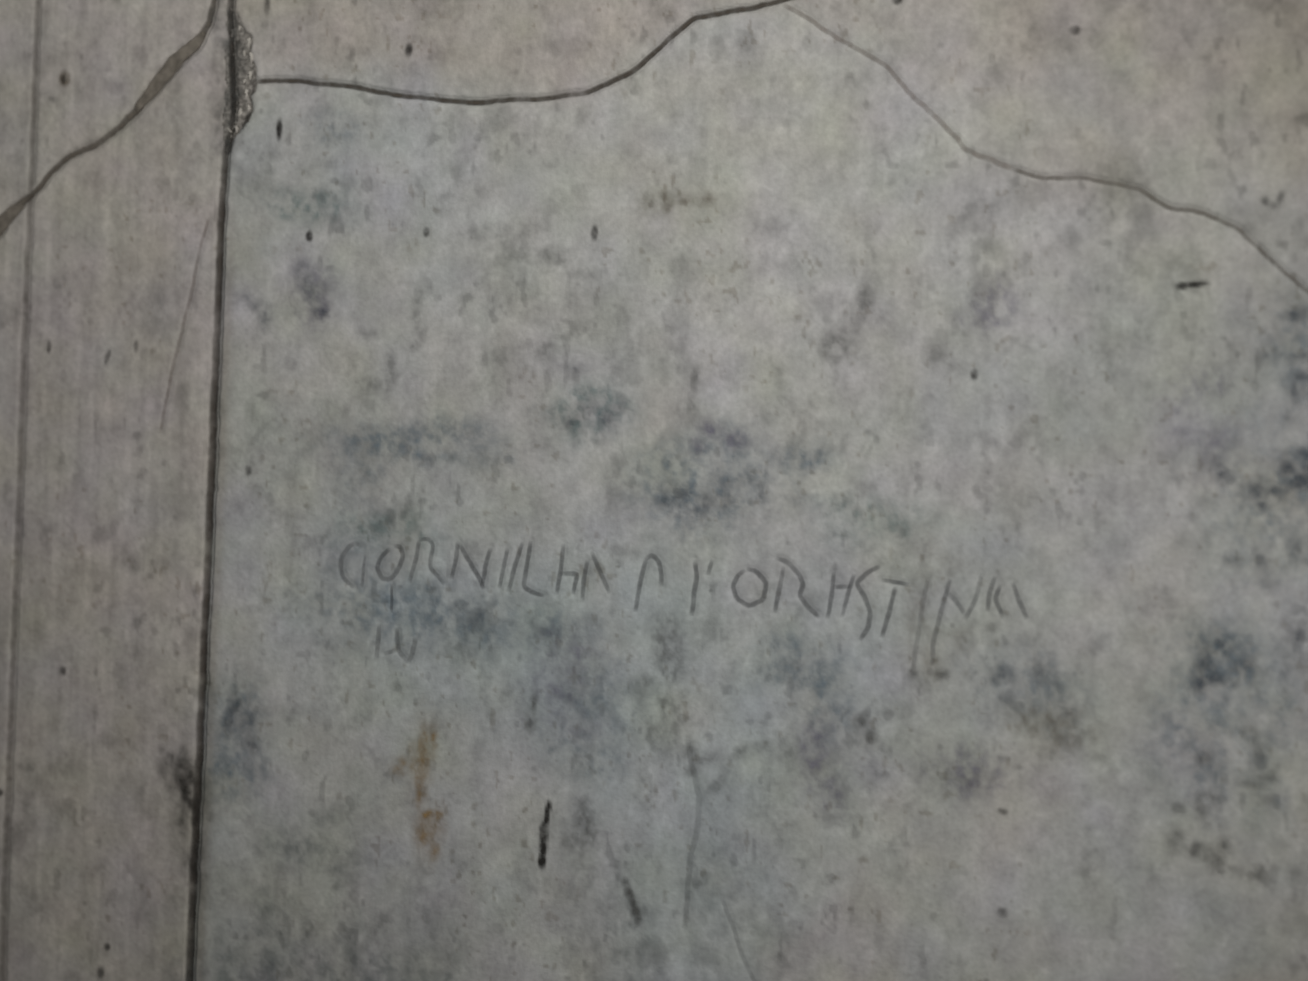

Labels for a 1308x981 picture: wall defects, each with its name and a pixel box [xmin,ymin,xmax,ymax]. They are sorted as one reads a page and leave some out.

crack [260,0,788,105]
crack [0,0,217,235]
crack [1148,194,1217,219]